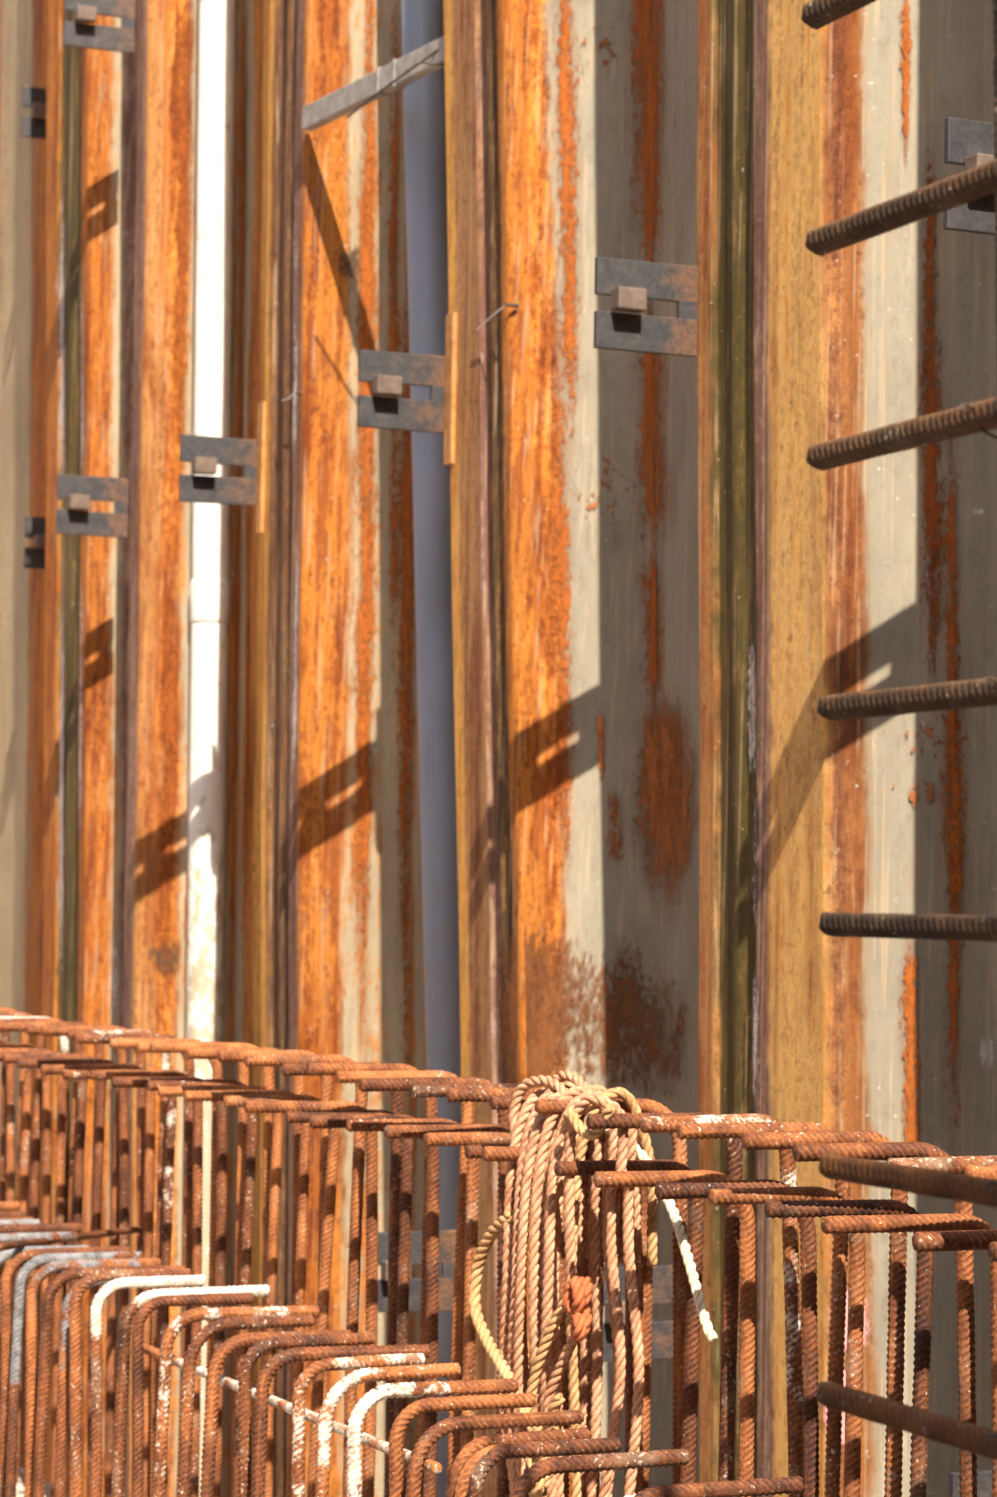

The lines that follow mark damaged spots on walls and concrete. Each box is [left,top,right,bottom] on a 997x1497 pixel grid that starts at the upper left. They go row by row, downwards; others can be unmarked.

rust [364,0,401,75]
rust [169,1,195,437]
rust [354,90,409,353]
rust [357,382,411,399]
rust [546,0,676,871]
rust [918,214,951,416]
rust [920,439,961,682]
rust [157,574,182,974]
rust [351,422,415,1061]
rust [893,709,969,914]
rust [899,942,922,1142]
rust [942,940,965,1127]